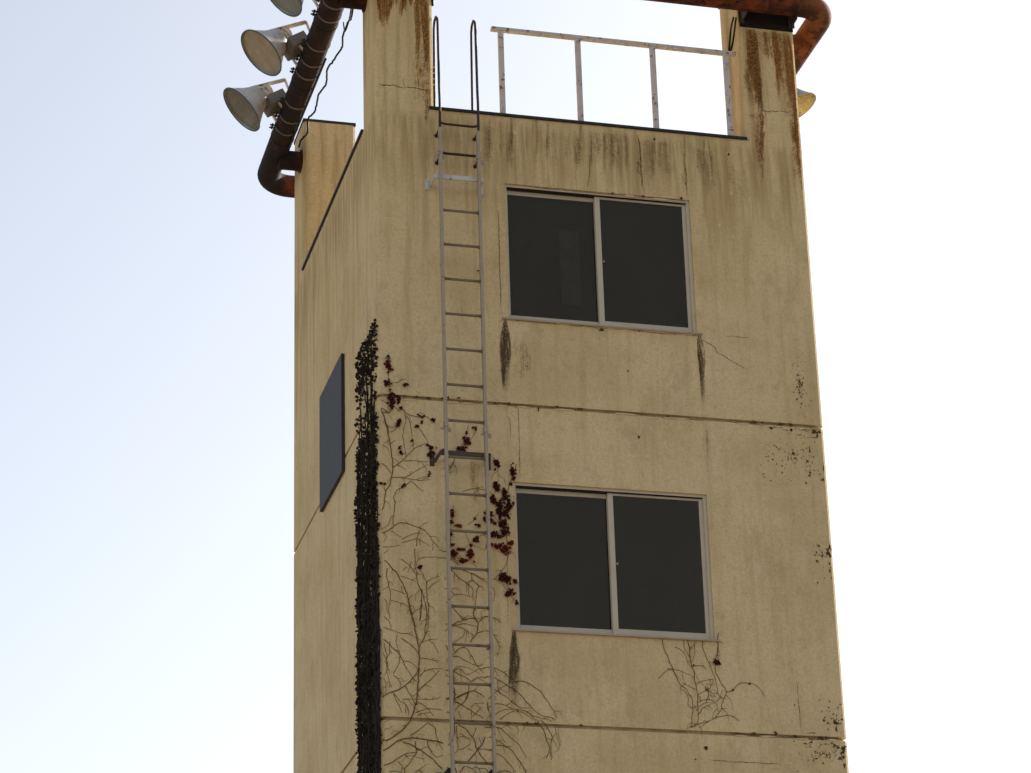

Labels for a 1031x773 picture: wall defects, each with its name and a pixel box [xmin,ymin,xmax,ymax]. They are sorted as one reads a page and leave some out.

water stain [500,323,511,382]